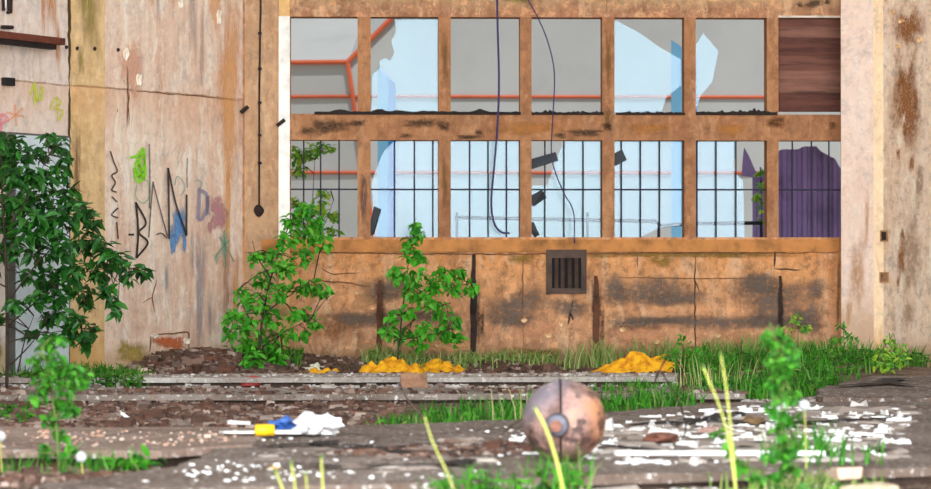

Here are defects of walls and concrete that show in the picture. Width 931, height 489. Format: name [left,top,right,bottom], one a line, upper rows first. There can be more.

corrosion [893,55,919,144]